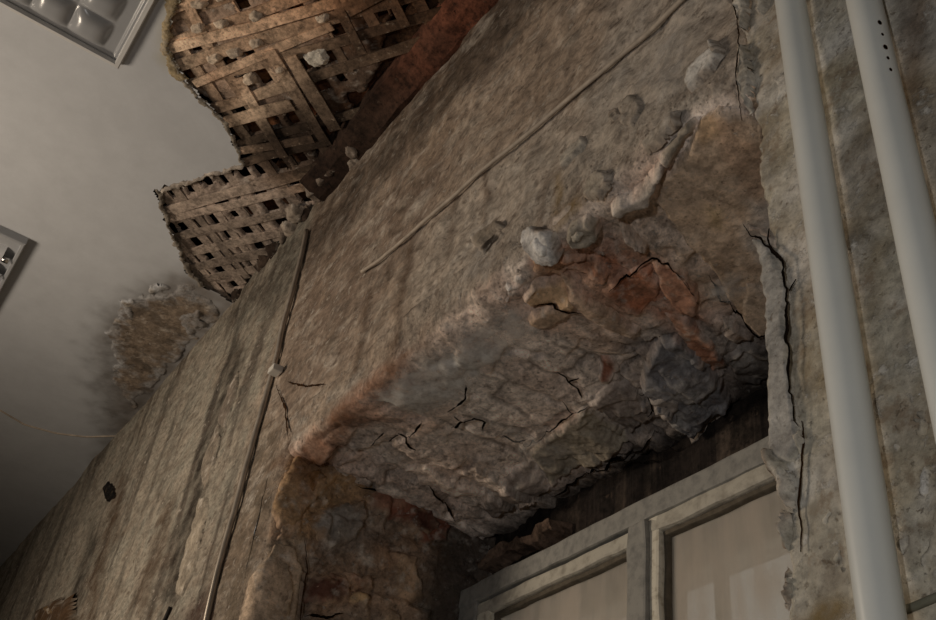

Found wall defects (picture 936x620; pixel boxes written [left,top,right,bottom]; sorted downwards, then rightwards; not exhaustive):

crack [732,0,742,120]
flaking render [104,0,393,409]
flaking render [482,0,777,518]
crack [276,382,324,435]
crack [371,424,421,451]
crack [448,372,587,447]
crack [551,394,659,497]
crack [609,224,805,552]
flaking render [239,456,451,620]
crack [429,486,456,522]
peeling [781,566,793,612]